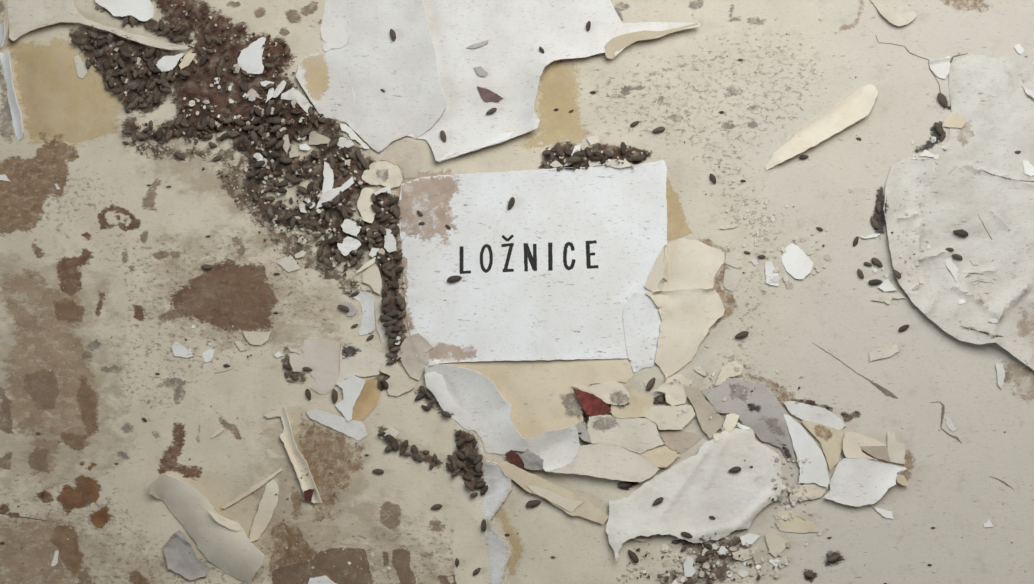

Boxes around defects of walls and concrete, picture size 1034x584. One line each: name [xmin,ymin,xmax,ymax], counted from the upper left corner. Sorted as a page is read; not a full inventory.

peeling [0,0,196,149]
peeling [265,0,700,223]
damp [0,133,79,234]
peeling [858,43,1034,370]
damp [0,180,160,475]
damp [158,423,202,478]
damp [160,259,277,332]
damp [219,417,242,440]
peeling [274,223,893,584]
peeling [995,363,1005,389]
damp [0,504,92,584]
damp [129,571,149,584]